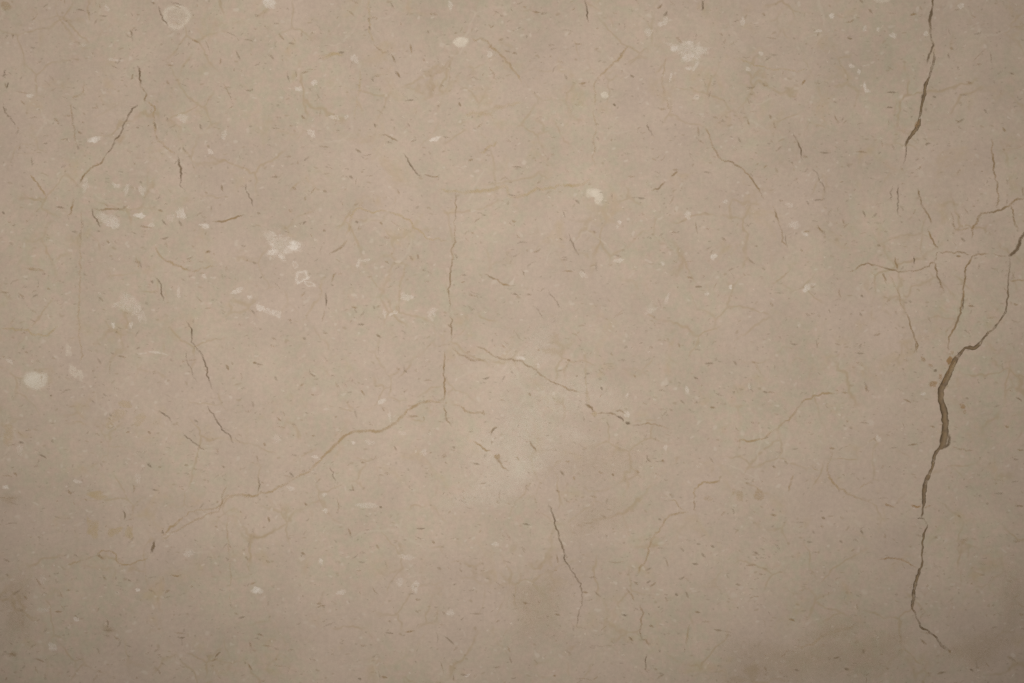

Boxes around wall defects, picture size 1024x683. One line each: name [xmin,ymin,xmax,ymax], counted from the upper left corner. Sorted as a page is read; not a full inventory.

crack [903,0,936,163]
crack [849,141,1024,649]
crack [548,505,583,626]